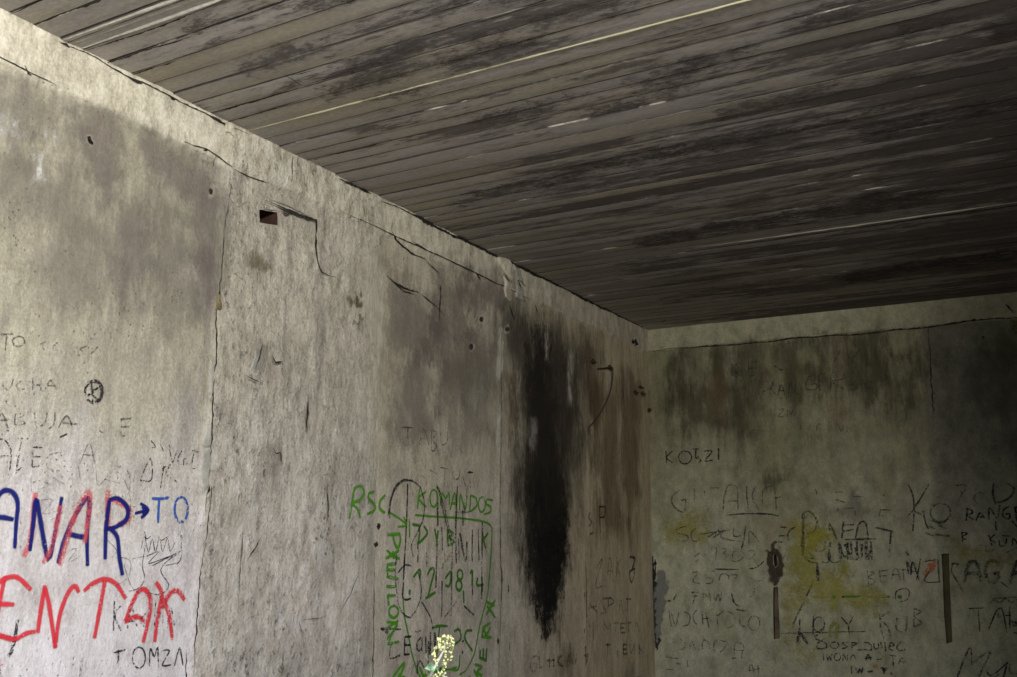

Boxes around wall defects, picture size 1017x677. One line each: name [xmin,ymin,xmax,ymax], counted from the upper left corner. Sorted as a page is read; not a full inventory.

crack [0,57,54,84]
damp [239,0,640,103]
damp [471,44,760,124]
damp [454,101,1017,208]
damp [633,190,944,248]
crack [61,42,334,677]
damp [496,328,504,378]